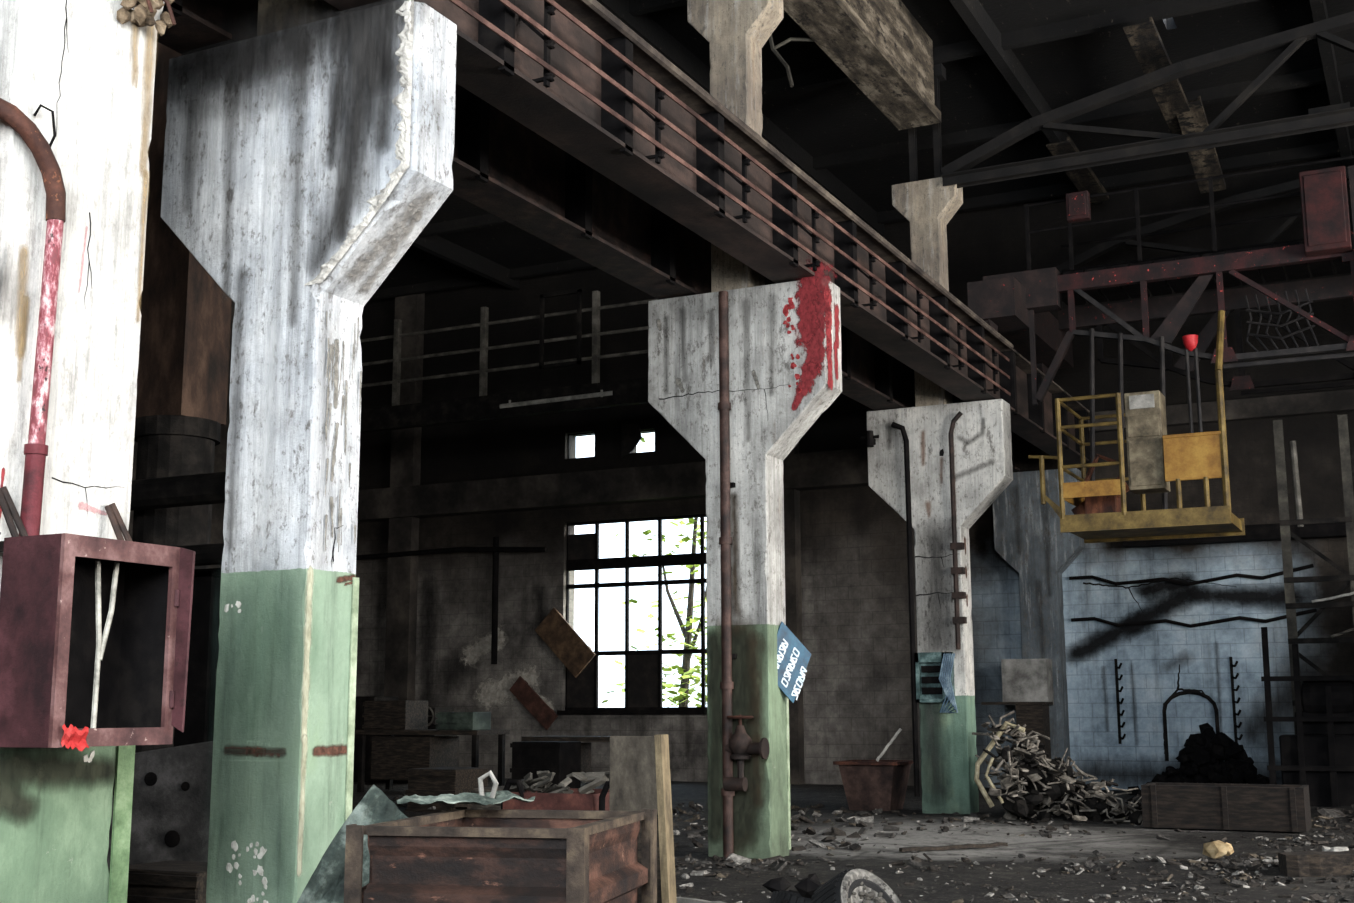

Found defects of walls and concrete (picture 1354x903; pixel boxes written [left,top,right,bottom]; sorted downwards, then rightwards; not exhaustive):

leakage [330,23,348,164]
leakage [371,7,392,147]
leakage [0,248,28,377]
peeling [226,841,268,903]